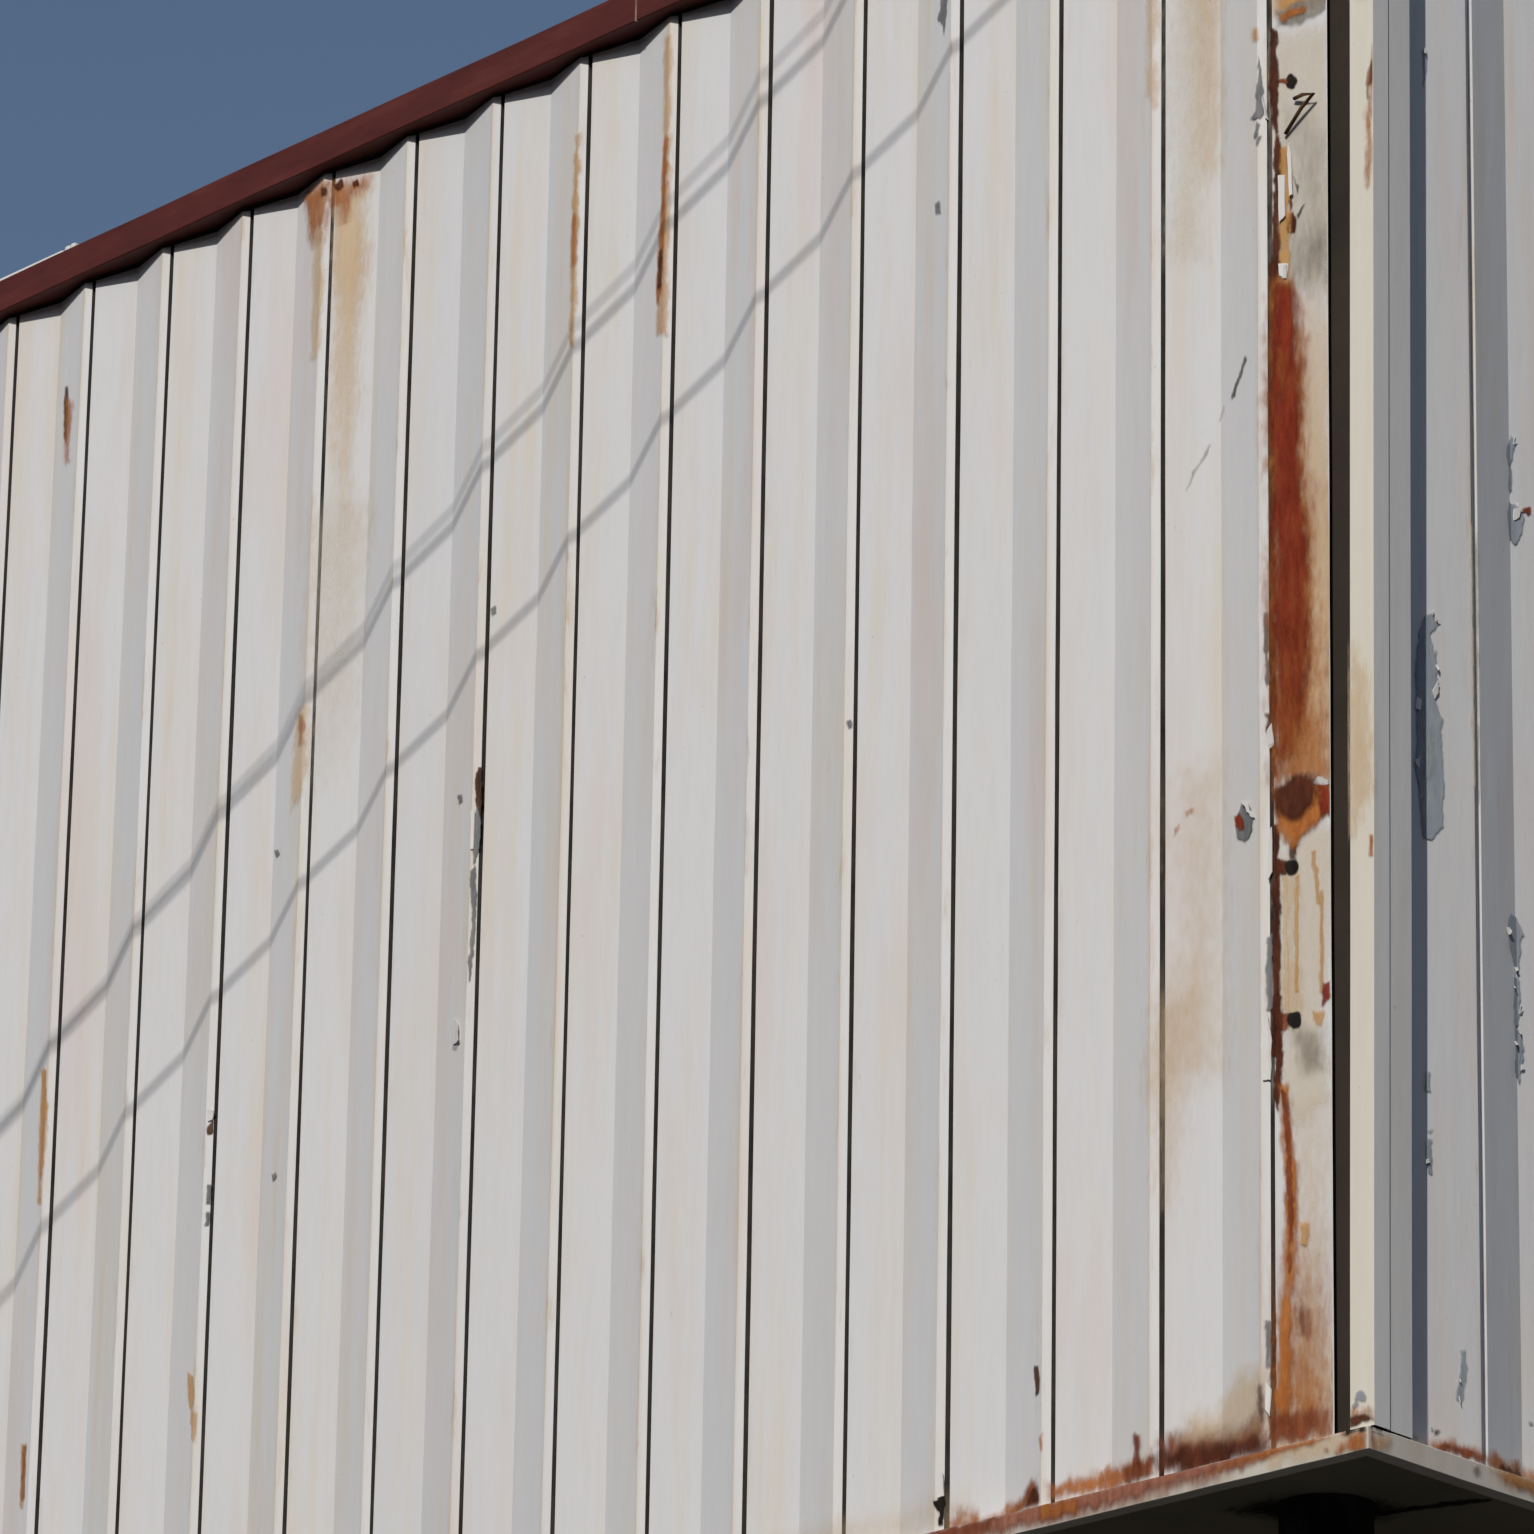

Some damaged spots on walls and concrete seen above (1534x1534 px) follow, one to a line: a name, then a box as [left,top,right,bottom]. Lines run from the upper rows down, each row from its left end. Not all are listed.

corrosion [304,178,364,378]
corrosion [656,136,668,332]
corrosion [1266,280,1330,879]
peeling [1506,436,1531,544]
peeling [1415,610,1445,839]
corrosion [1313,982,1330,1024]
peeling [1507,914,1524,1082]
corrosion [926,1084,1401,1534]
corrosion [1432,1442,1534,1491]